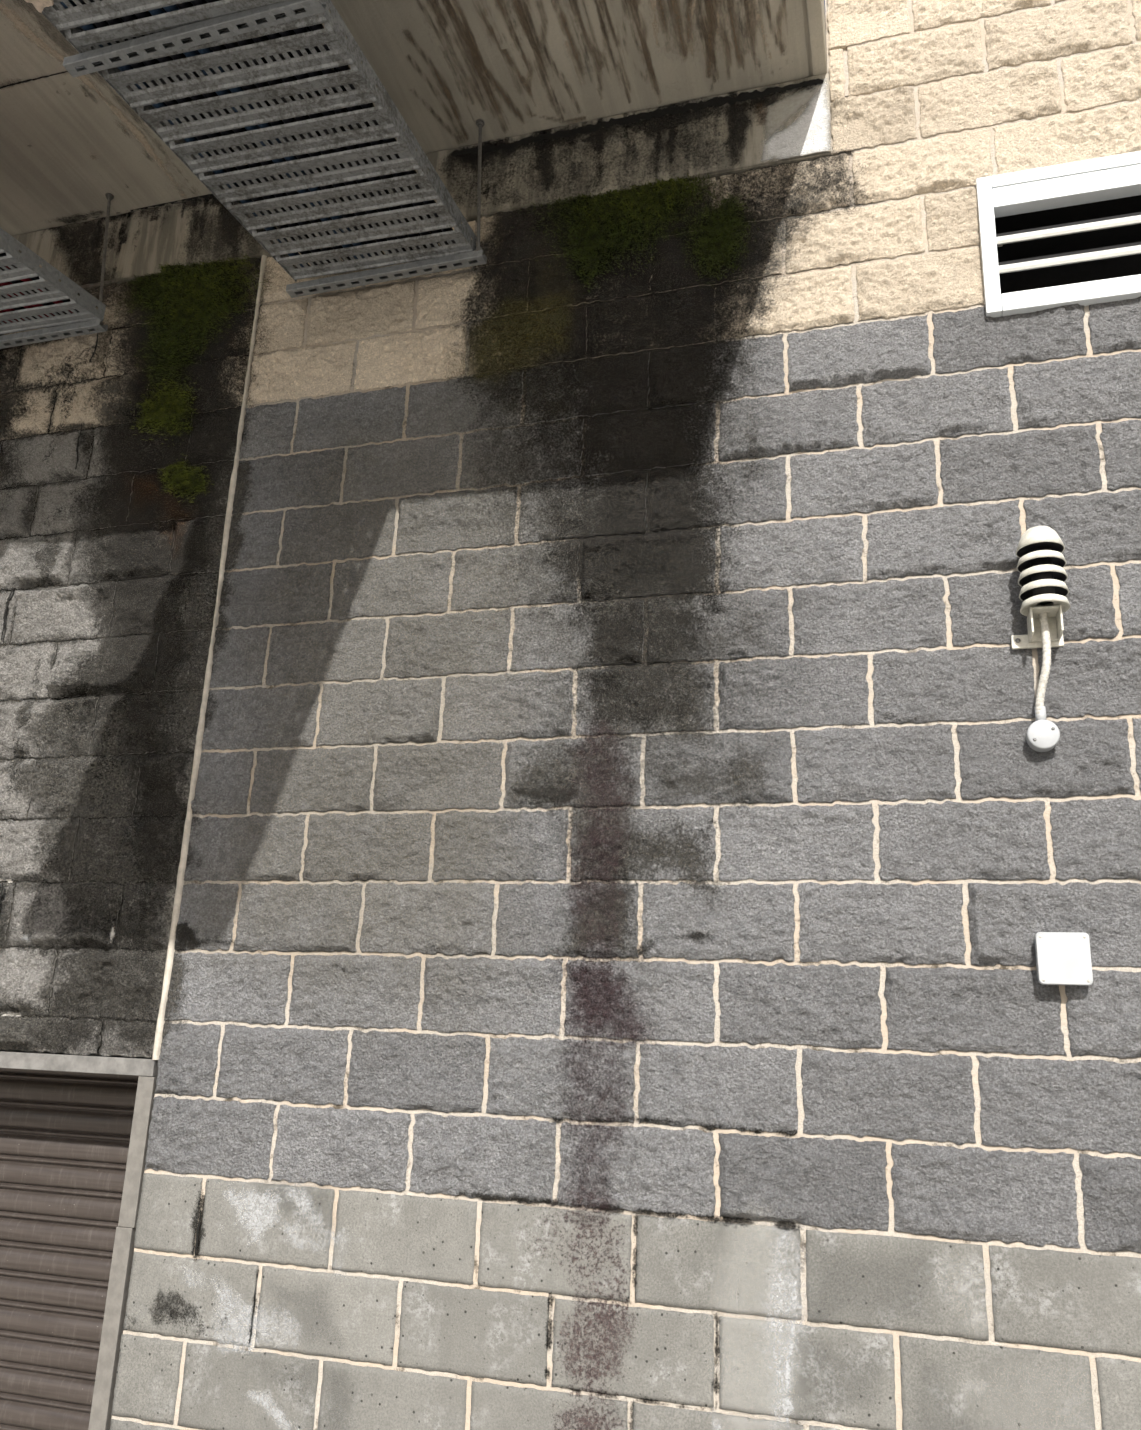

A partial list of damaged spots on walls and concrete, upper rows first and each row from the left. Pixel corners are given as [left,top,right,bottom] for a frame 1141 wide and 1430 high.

damp [0,0,79,61]
damp [407,0,859,960]
damp [0,72,269,1056]
damp [590,1117,720,1131]
damp [459,1192,754,1296]
damp [775,1221,800,1238]
damp [150,1290,266,1350]
damp [545,1293,554,1349]
damp [769,1262,802,1423]